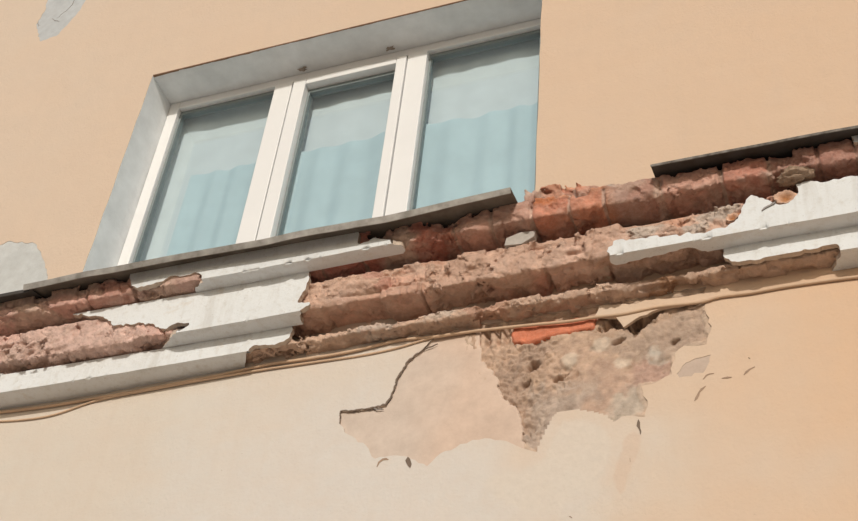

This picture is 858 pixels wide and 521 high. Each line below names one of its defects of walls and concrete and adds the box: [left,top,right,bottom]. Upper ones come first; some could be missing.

peeling [36,0,86,41]
flaking render [0,241,220,375]
flaking render [341,288,719,467]